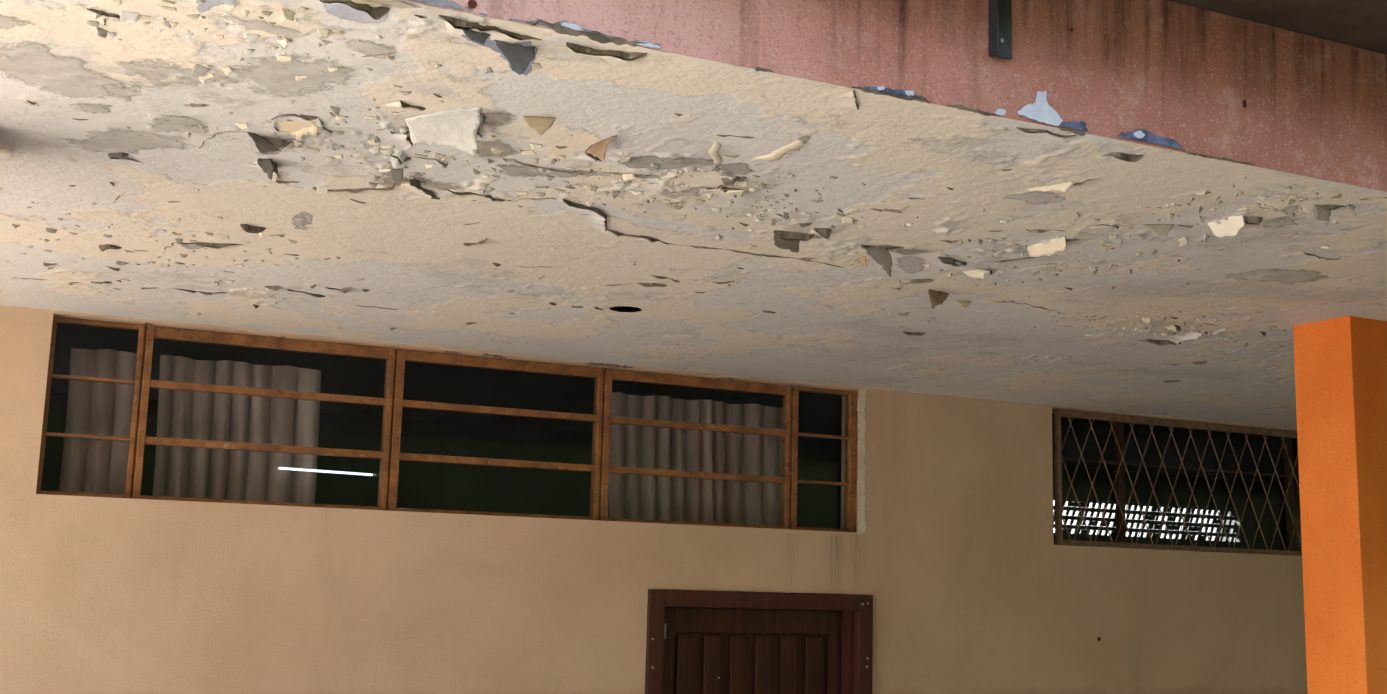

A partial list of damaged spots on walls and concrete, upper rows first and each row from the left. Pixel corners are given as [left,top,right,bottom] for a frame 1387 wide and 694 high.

crack [71,105,197,203]
peeling [0,0,1387,340]
crack [21,177,844,330]